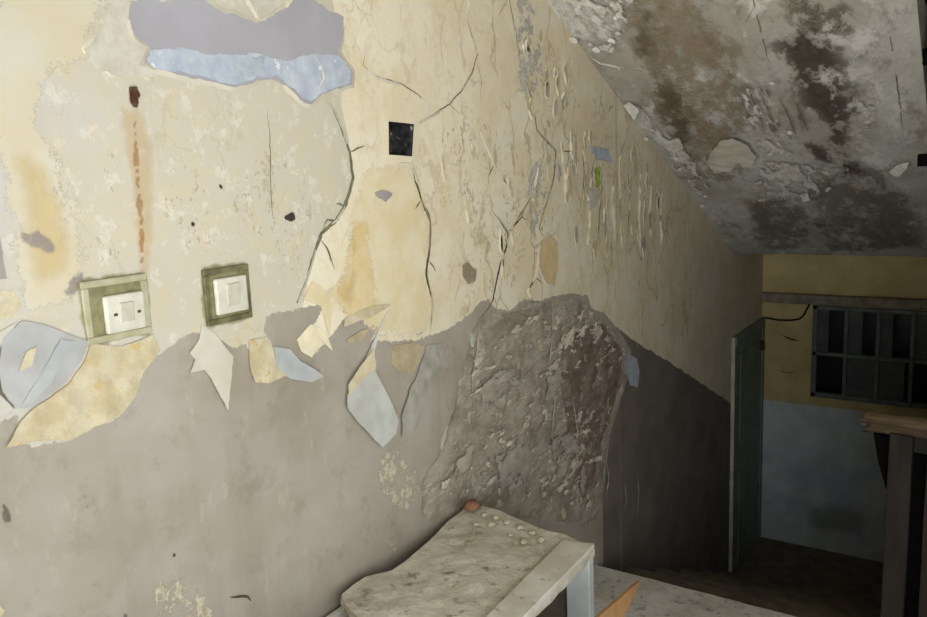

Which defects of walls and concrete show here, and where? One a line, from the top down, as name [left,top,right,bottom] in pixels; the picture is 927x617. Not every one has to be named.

rust [129,86,140,108]
peeling [0,0,355,448]
crack [297,97,364,303]
peeling [249,111,447,447]
crack [363,0,482,124]
crack [411,158,436,325]
crack [498,0,520,57]
crack [480,80,571,313]
spalling [418,0,673,525]
water stain [632,0,740,177]
peeling [615,84,849,222]
water stain [776,0,864,173]